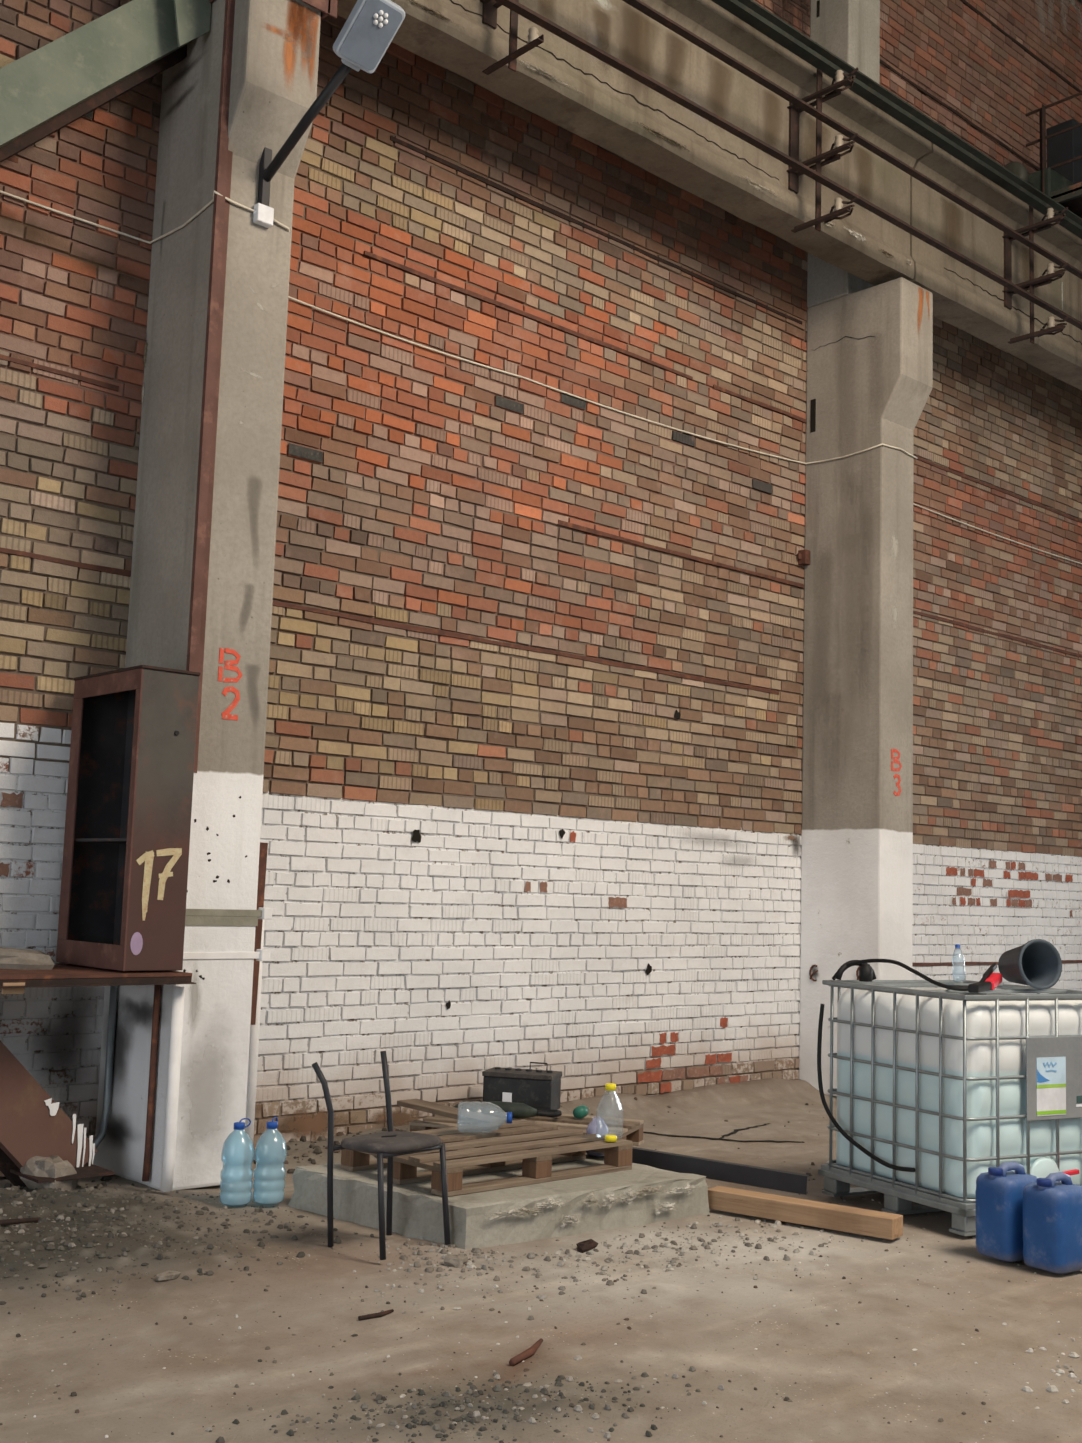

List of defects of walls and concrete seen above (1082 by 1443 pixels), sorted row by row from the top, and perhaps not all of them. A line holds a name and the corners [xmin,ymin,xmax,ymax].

rust [272,3,318,72]
rust [918,288,929,324]
peeling [1,792,23,808]
peeling [0,862,10,877]
peeling [946,860,1073,908]
peeling [637,1032,748,1093]